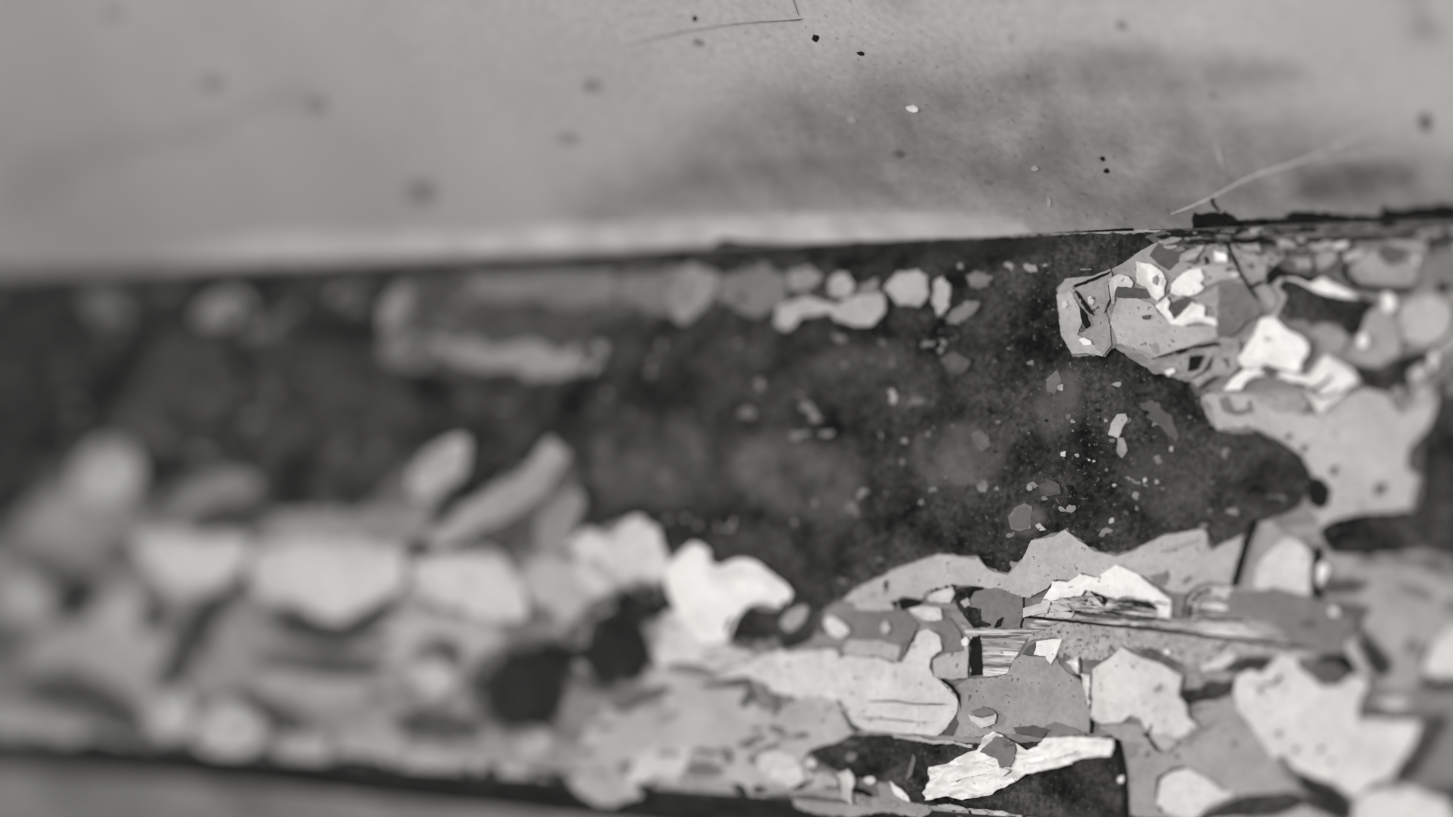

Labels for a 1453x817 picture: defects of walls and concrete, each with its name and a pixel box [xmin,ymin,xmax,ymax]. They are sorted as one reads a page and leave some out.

peeling [196,291,253,326]
peeling [381,284,608,380]
peeling [454,264,994,331]
peeling [941,351,972,374]
peeling [1046,370,1064,394]
peeling [1056,236,1453,528]
peeling [971,431,998,453]
peeling [0,438,1453,817]